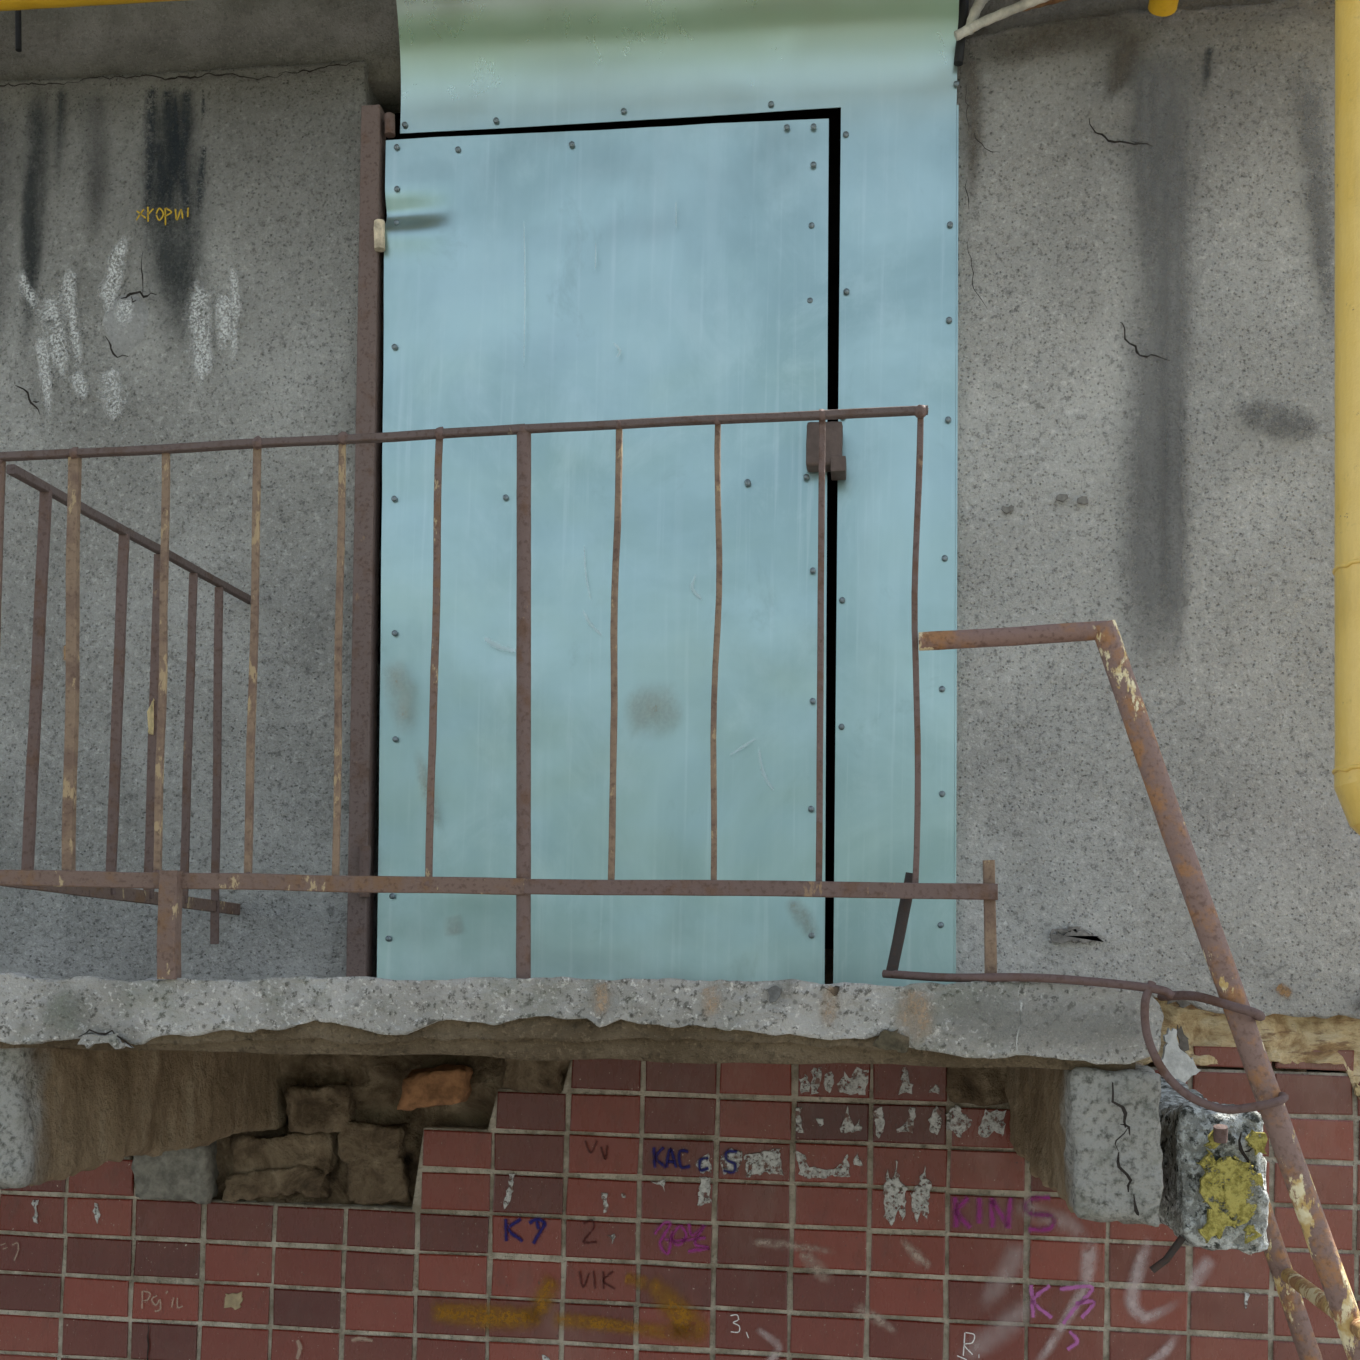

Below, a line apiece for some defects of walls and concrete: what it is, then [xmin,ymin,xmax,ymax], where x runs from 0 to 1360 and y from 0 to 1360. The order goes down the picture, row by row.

crack [1089,118,1153,147]
leakage [20,91,87,403]
leakage [100,241,132,323]
crack [121,253,157,303]
leakage [146,89,240,380]
crack [1120,322,1170,361]
leakage [103,370,121,416]
flaking render [825,949,840,996]
flaking render [1272,1062,1307,1074]
flaking render [78,1016,1006,1209]
crack [1111,1082,1139,1216]
peeling [883,1160,932,1226]